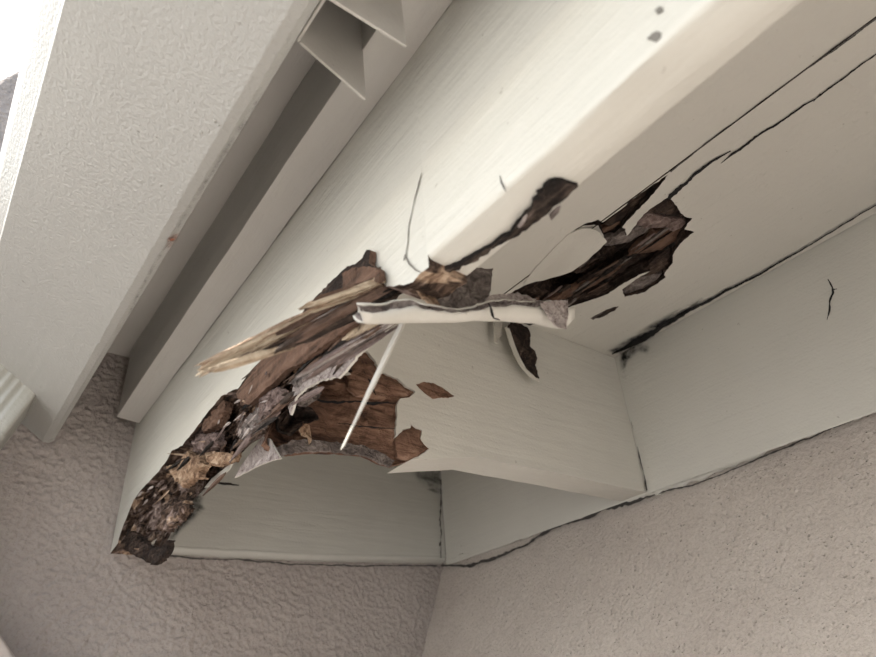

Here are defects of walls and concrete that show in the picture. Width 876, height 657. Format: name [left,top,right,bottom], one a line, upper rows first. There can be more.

crack [668,18,876,200]
crack [612,205,876,354]
peeling [591,307,618,320]
leakage [611,313,682,367]
peeling [416,382,454,399]
peeling [299,423,312,444]
peeling [204,437,282,488]
crack [170,420,854,568]